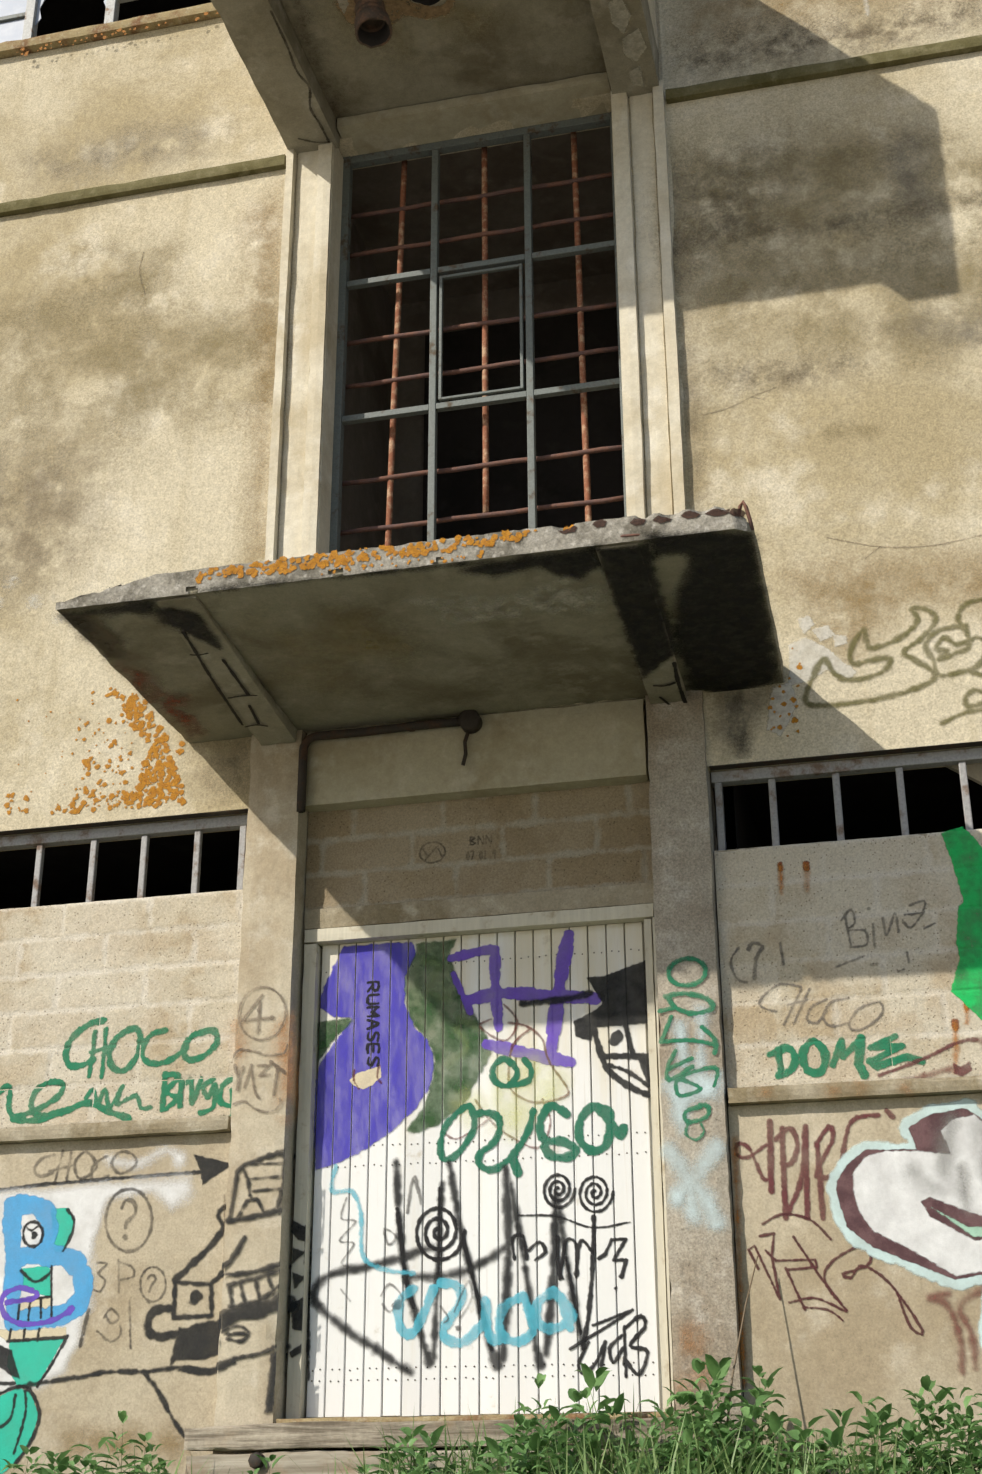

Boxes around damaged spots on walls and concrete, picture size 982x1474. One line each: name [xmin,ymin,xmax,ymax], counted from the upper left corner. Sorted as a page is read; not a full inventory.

crack [270,11,330,143]
spalling [382,0,455,25]
leakage [845,23,901,40]
leakage [57,599,221,731]